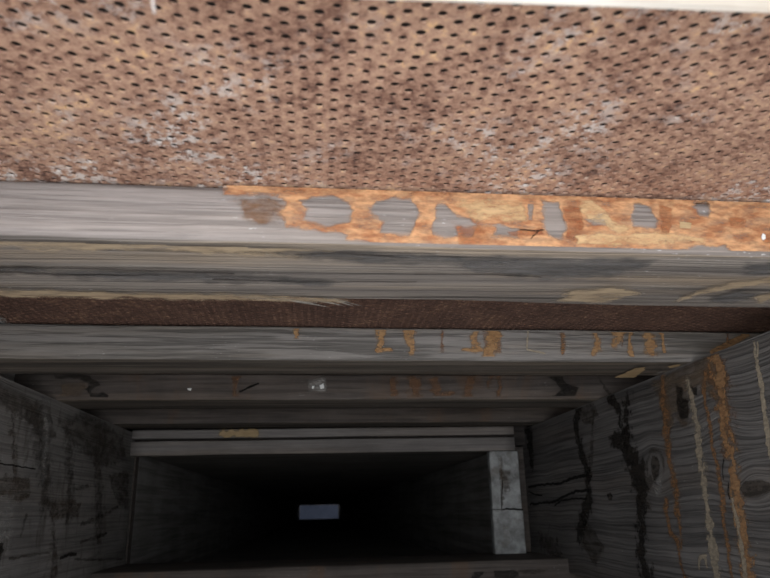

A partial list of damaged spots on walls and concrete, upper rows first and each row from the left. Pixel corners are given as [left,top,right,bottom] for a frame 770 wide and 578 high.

corrosion [224,185,770,252]
corrosion [461,331,502,357]
corrosion [611,332,666,357]
leakage [548,376,579,396]
crack [0,460,36,470]
leakage [0,392,128,578]
crack [501,472,589,511]
leakage [573,404,603,563]
leakage [601,381,654,578]
corrosion [702,333,757,578]